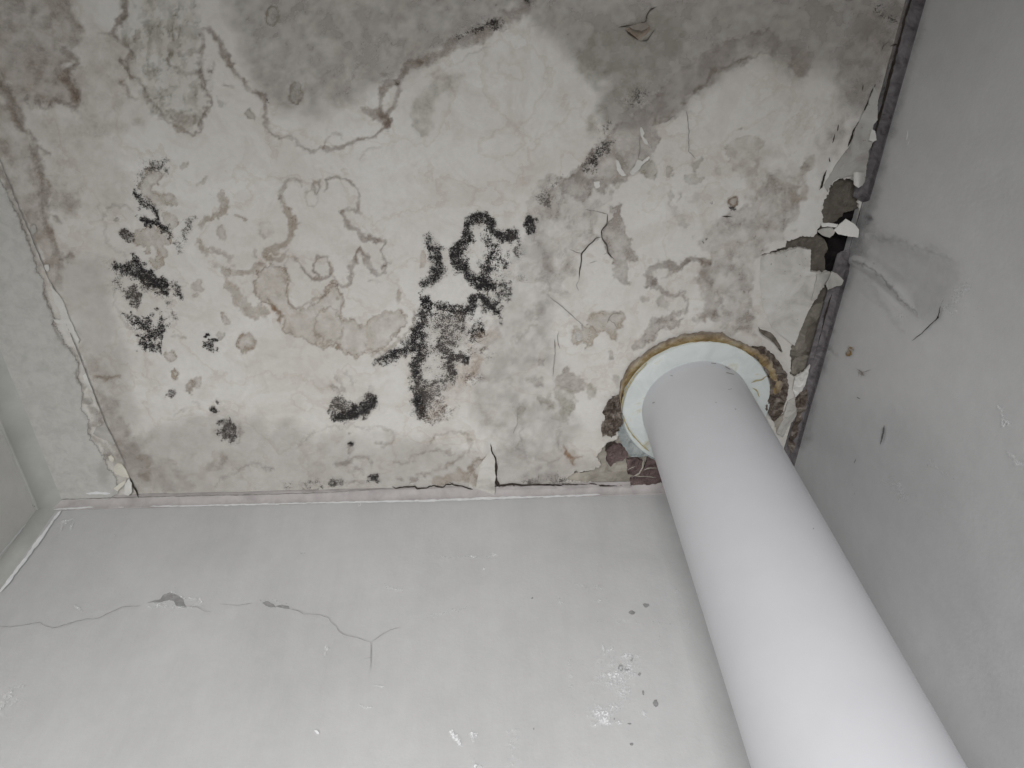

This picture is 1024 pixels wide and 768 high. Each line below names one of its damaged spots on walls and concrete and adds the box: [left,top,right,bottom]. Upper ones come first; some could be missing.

water stain [567,0,736,177]
crack [0,160,56,291]
peeling [0,455,132,592]
water stain [112,159,196,354]
water stain [202,333,219,353]
water stain [209,402,237,443]
crack [61,324,616,500]
water stain [327,393,380,423]
flaking render [150,394,662,507]
water stain [373,210,539,420]
crack [550,184,614,373]
peeling [751,86,878,454]